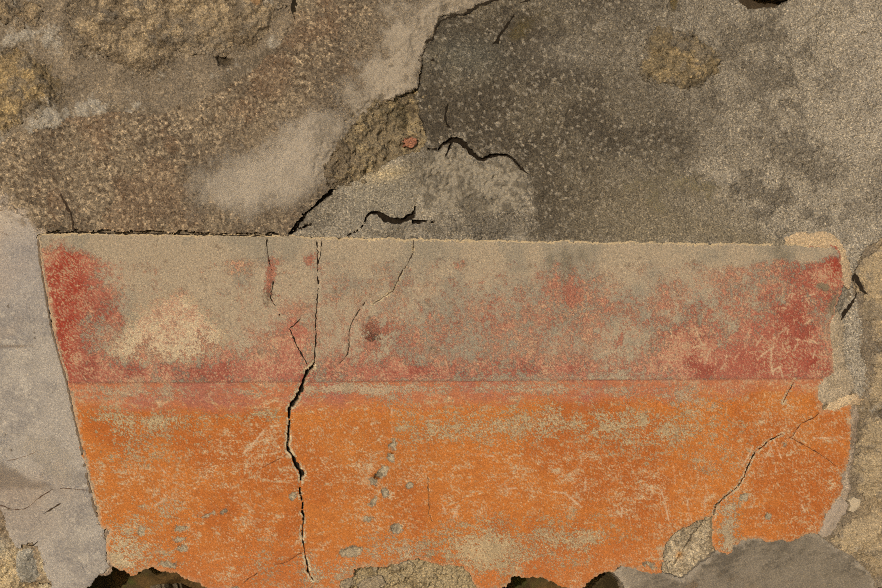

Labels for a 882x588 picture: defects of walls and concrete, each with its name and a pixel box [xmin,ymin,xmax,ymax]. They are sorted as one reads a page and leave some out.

crack [425,0,529,61]
spalling [323,89,530,216]
crack [427,104,528,174]
crack [340,206,435,363]
crack [0,189,333,583]
spalling [242,507,633,588]
crack [712,413,836,520]
flaking render [818,496,861,537]